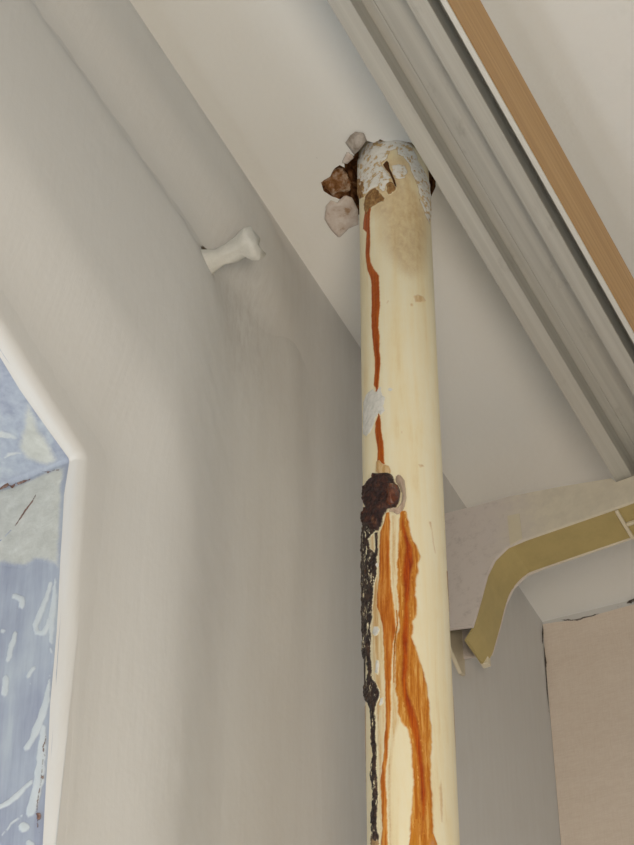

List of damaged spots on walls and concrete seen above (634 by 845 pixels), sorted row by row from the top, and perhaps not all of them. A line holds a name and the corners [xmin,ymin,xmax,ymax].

peeling [321,132,436,237]
rust [360,150,431,391]
rust [374,413,386,464]
rust [360,511,444,845]